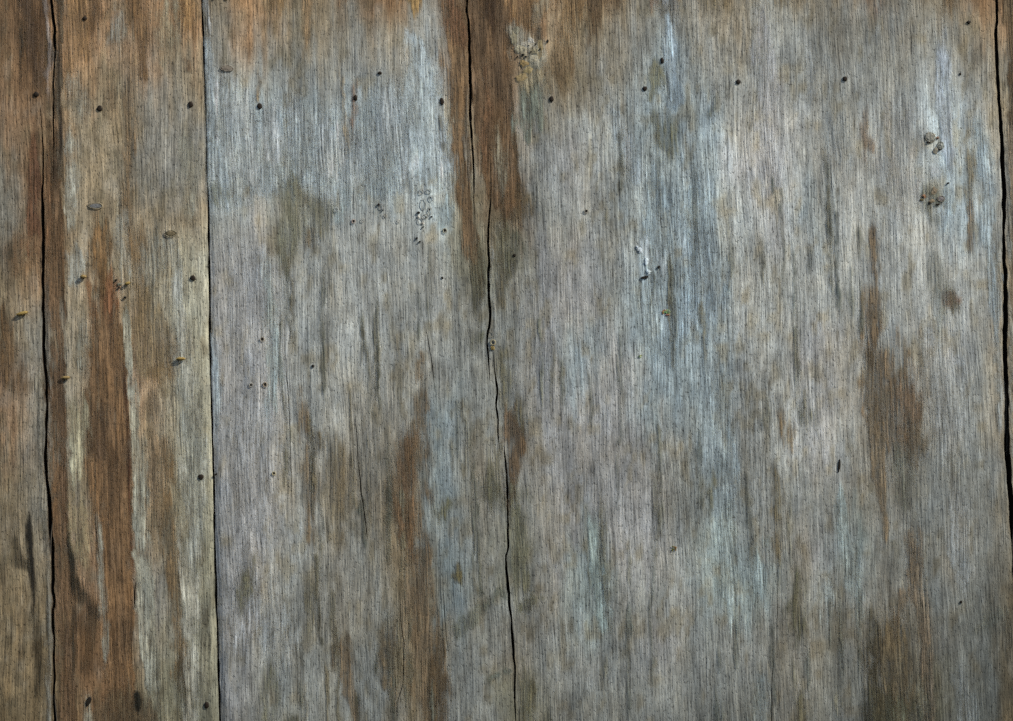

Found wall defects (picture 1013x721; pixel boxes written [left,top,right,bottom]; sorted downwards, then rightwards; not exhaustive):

crack [35,0,57,721]
crack [462,0,520,721]
crack [994,0,1013,576]